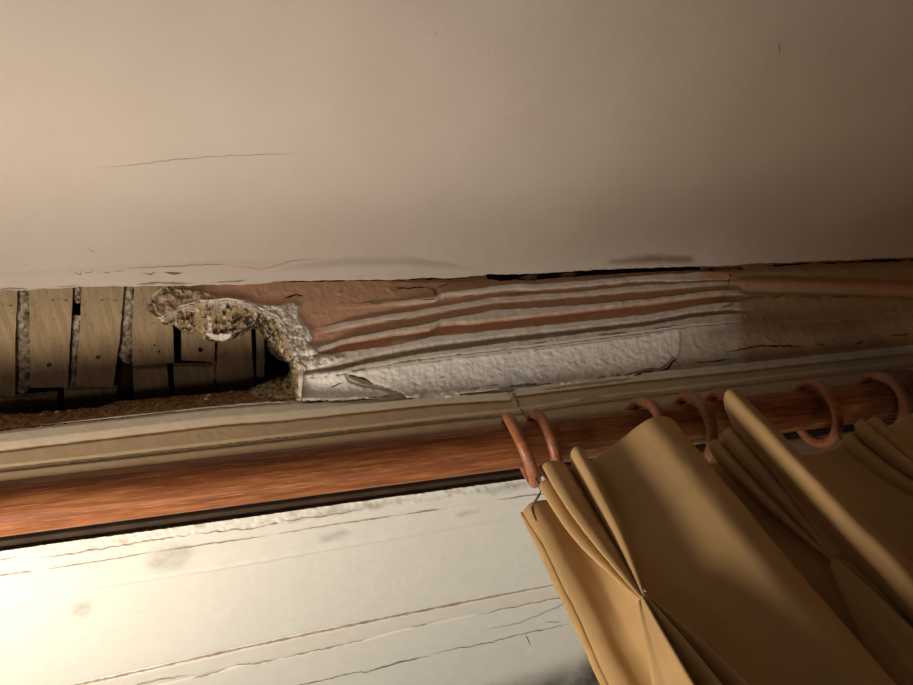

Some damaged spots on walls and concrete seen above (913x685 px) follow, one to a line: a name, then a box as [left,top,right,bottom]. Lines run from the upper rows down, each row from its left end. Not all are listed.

peeling [0,272,681,430]
crack [75,585,564,685]